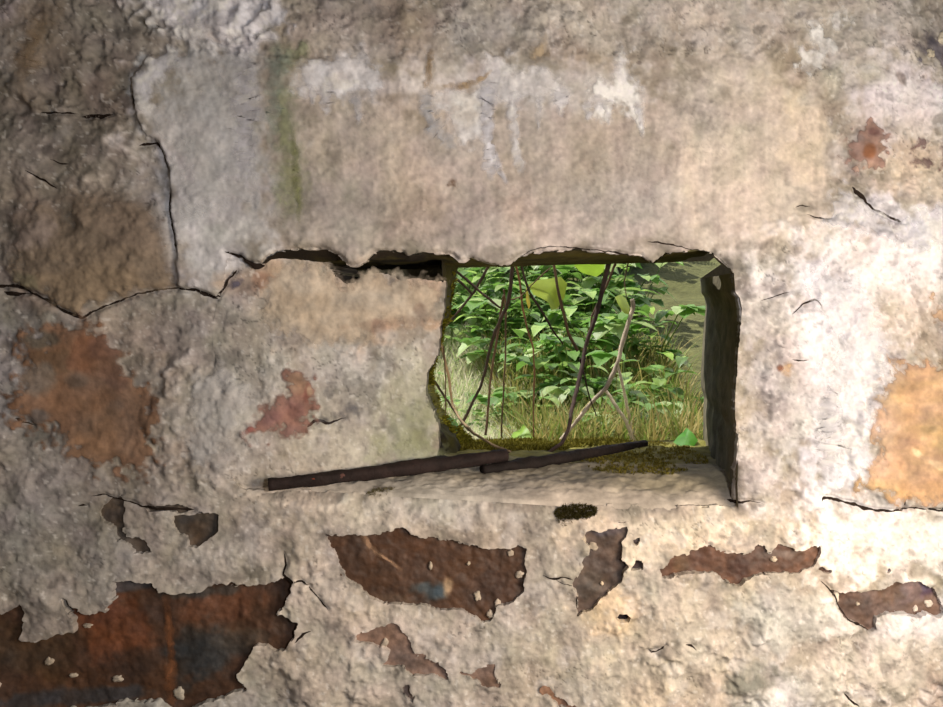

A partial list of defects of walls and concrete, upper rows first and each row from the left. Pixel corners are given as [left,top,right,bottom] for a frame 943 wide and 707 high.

water stain [299,43,383,120]
water stain [421,50,567,179]
water stain [583,53,644,133]
crack [168,195,176,248]
crack [852,187,902,223]
crack [0,252,265,319]
crack [822,496,943,512]
spalling [0,577,298,707]
spalling [326,527,527,621]
spalling [572,522,643,616]
spalling [660,544,830,584]
spalling [832,581,941,630]